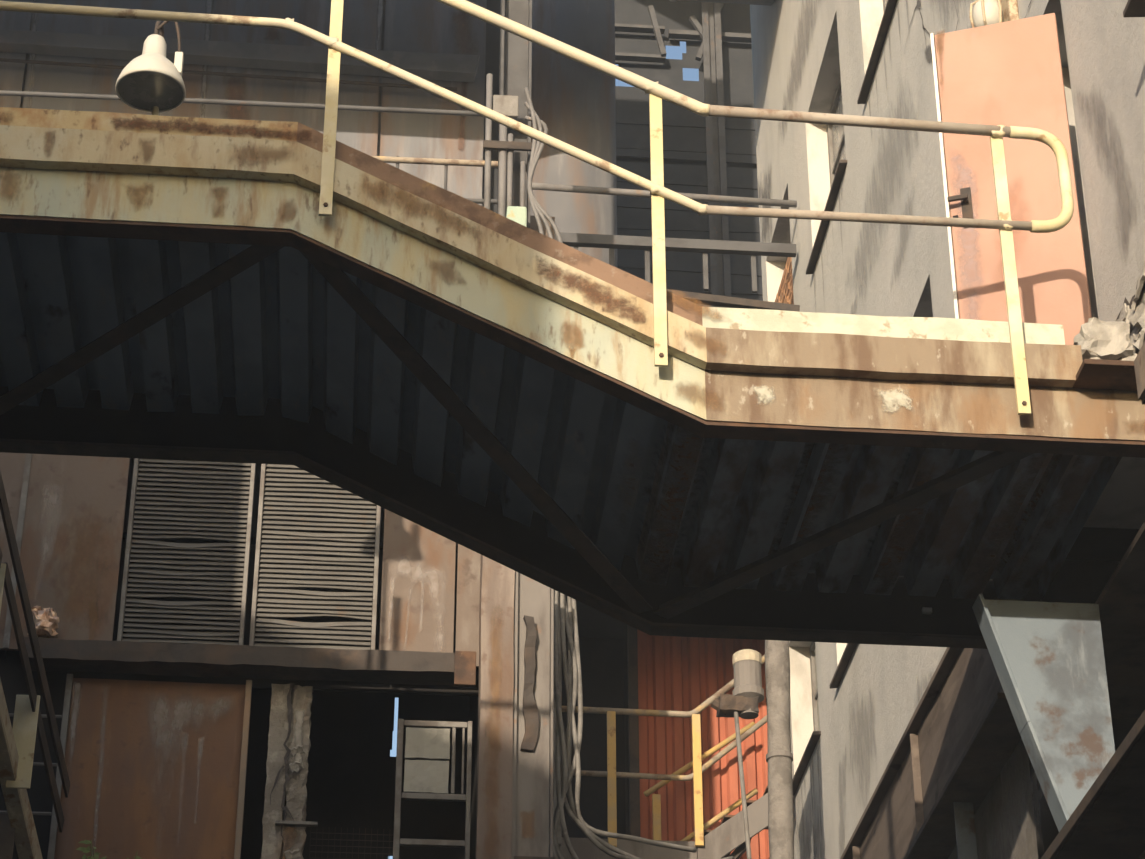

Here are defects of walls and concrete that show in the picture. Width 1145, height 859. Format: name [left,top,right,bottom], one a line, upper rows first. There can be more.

corrosion [538,260,645,322]
peeling [1116,260,1145,354]
corrosion [564,324,582,359]
corrosion [691,334,717,352]
corrosion [680,386,720,406]
spalling [289,711,305,773]